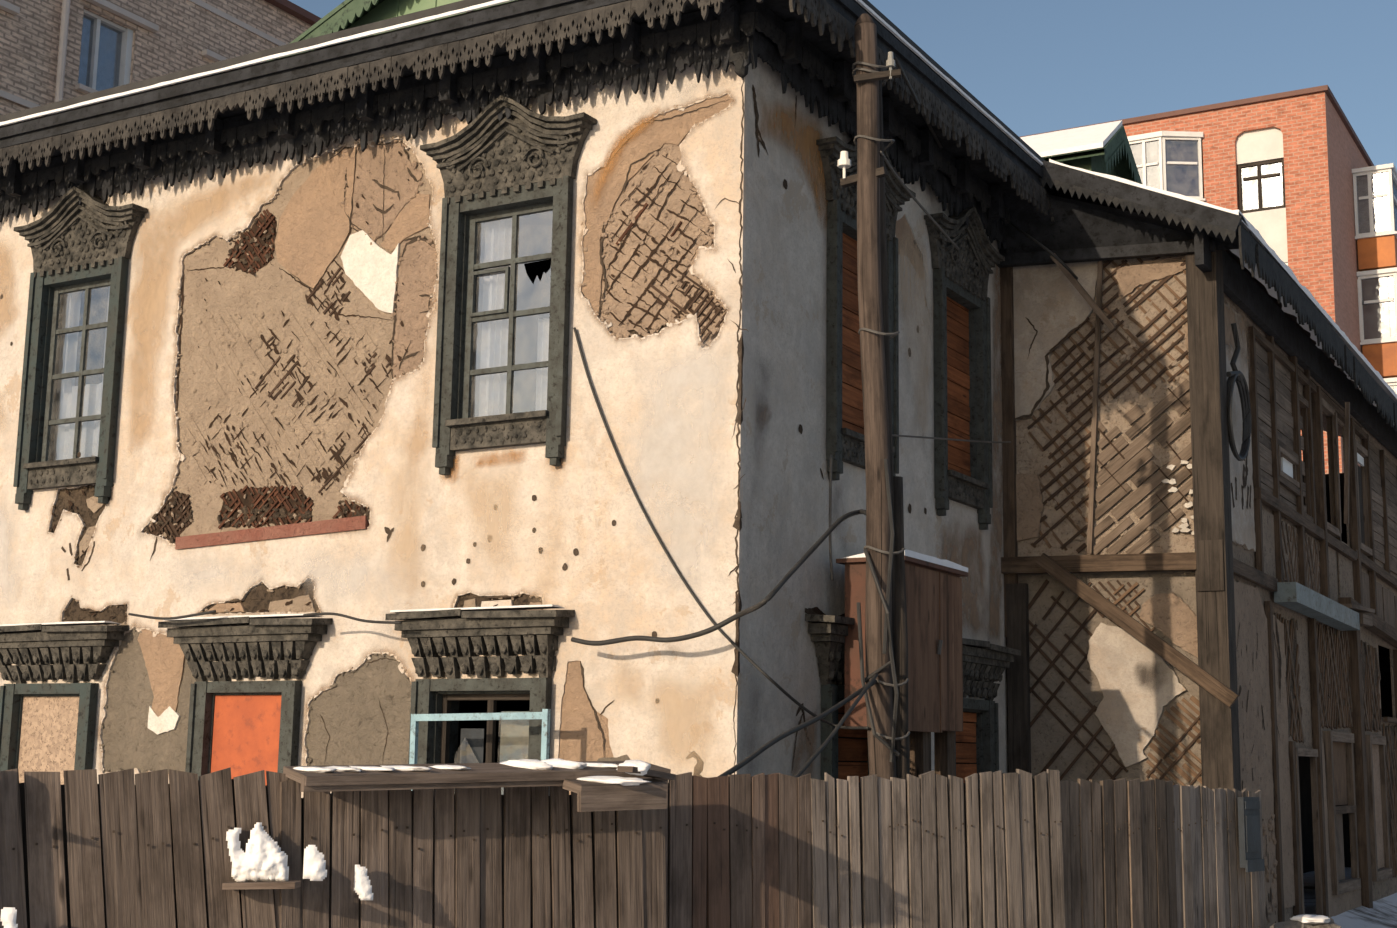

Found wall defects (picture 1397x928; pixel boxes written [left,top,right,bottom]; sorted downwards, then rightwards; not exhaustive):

peeling [580,92,734,348]
peeling [143,136,439,550]
crack [686,82,768,777]
flaking render [735,334,744,425]
flaking render [732,501,742,532]
peeling [1162,460,1195,551]
peeling [48,484,196,775]
flaking render [200,579,322,615]
flaking render [731,589,742,677]
peeling [305,652,412,766]
peeling [559,661,614,761]